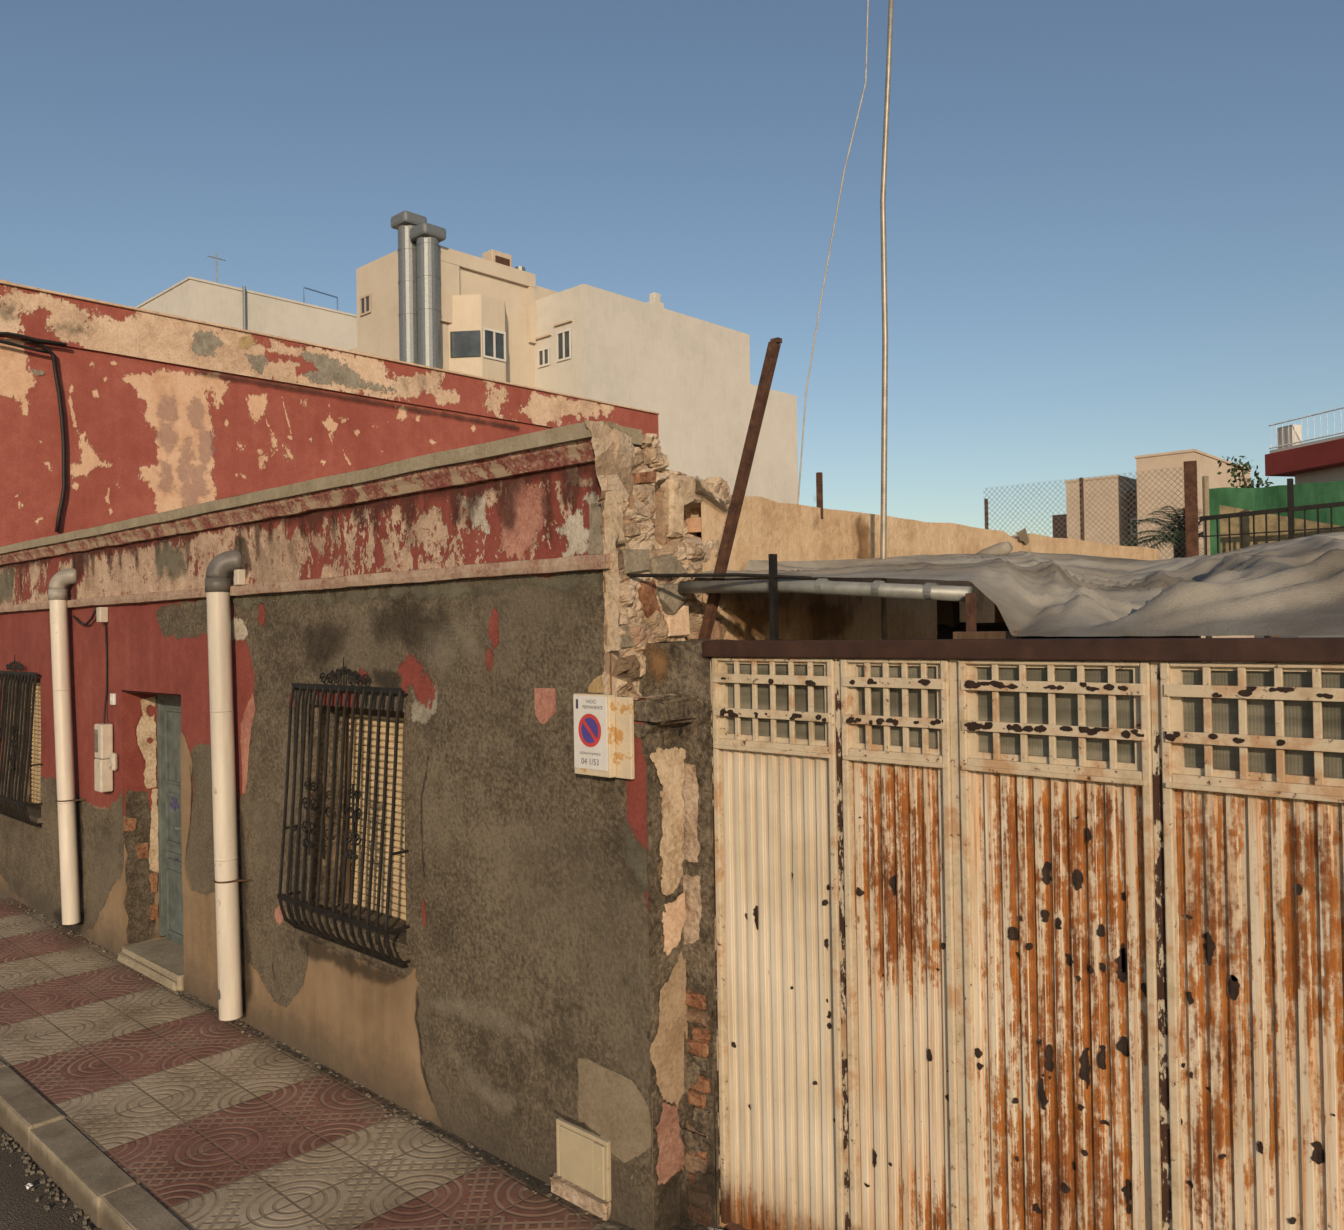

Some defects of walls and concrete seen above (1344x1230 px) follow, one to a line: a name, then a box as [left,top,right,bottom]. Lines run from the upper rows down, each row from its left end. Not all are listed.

peeling [0,285,460,513]
flaking render [0,380,731,1186]
flaking render [610,1148,653,1230]
flaking render [682,980,715,1230]
corrosion [730,1174,819,1230]
corrosion [852,760,945,1013]
corrosion [872,1150,951,1230]
corrosion [974,773,1147,1230]
corrosion [1175,789,1344,1230]